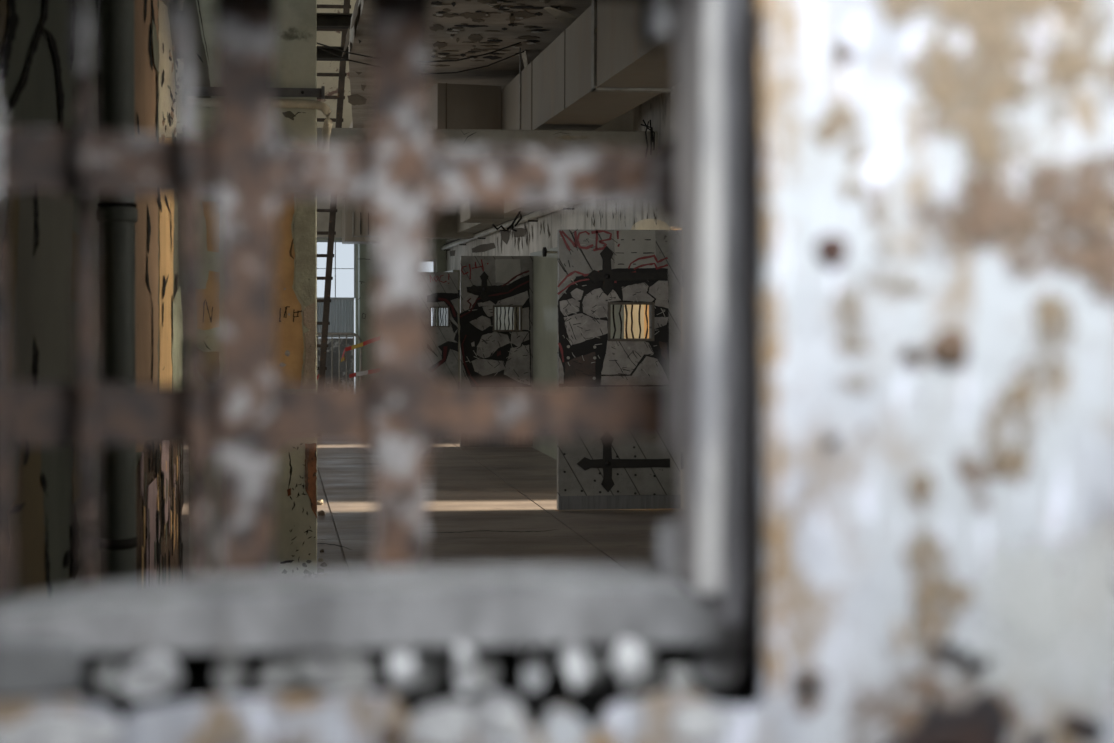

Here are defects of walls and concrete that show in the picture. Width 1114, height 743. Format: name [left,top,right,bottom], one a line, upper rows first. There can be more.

crack [1,0,73,129]
peeling [429,0,578,68]
rust [909,472,932,512]
rust [904,530,974,658]
rust [1063,713,1105,739]